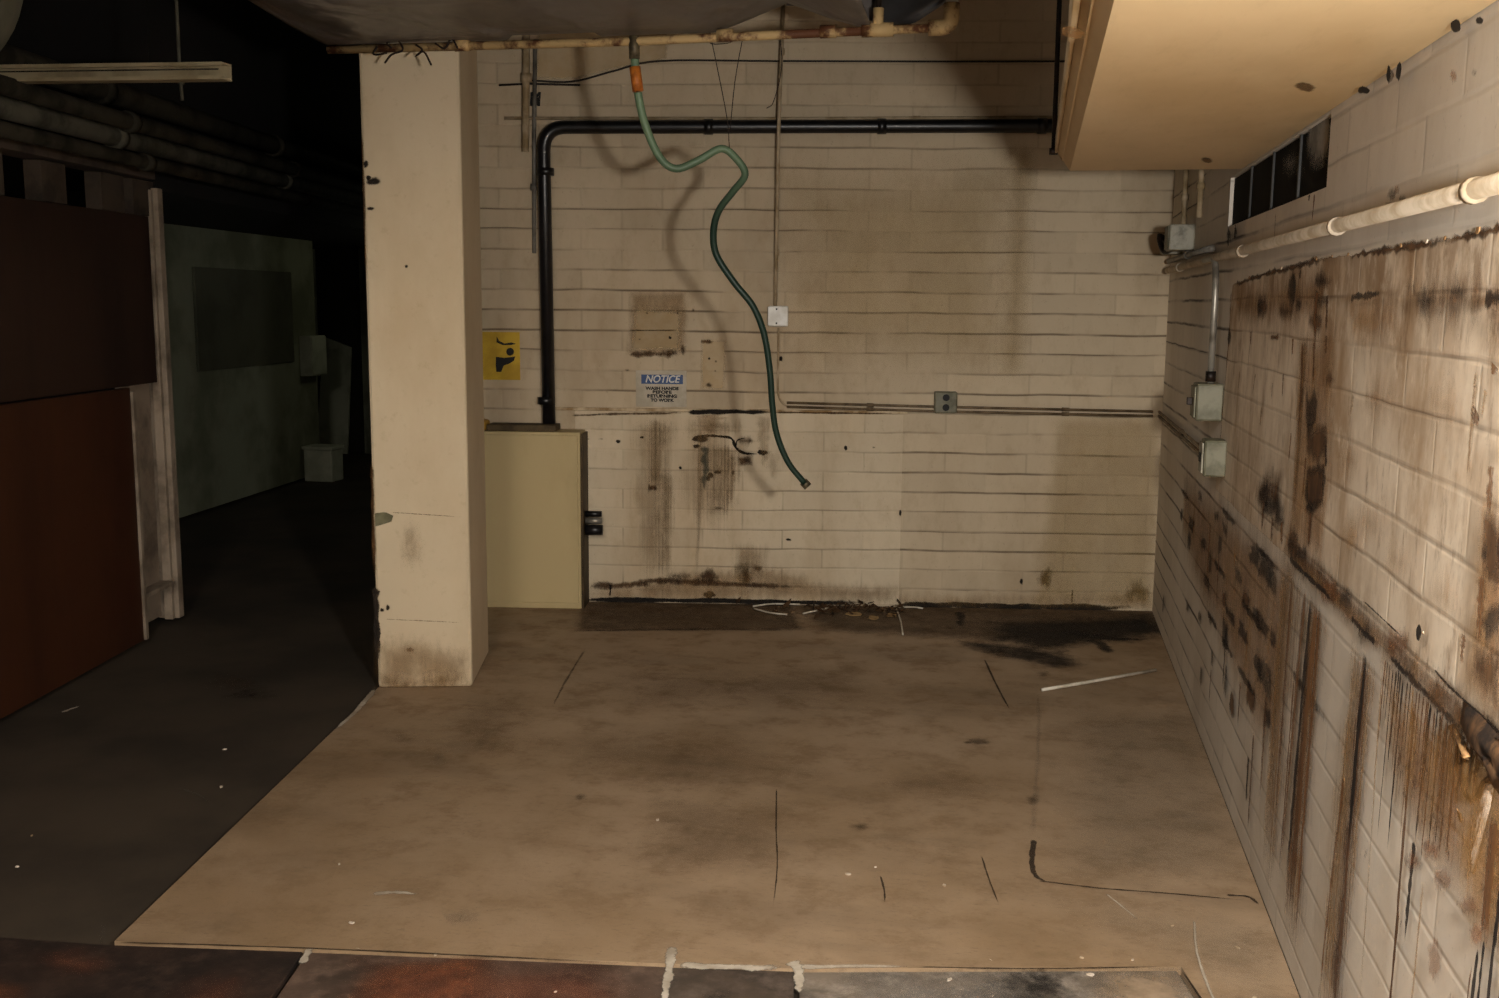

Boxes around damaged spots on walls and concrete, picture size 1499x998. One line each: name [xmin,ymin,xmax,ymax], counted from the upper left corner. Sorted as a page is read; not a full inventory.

leakage [584,566,1146,651]
rust [1289,336,1332,544]
peeling [1215,223,1499,730]
rust [1460,466,1499,698]
rust [1467,363,1498,470]
rust [1265,569,1326,928]
rust [1321,657,1499,998]